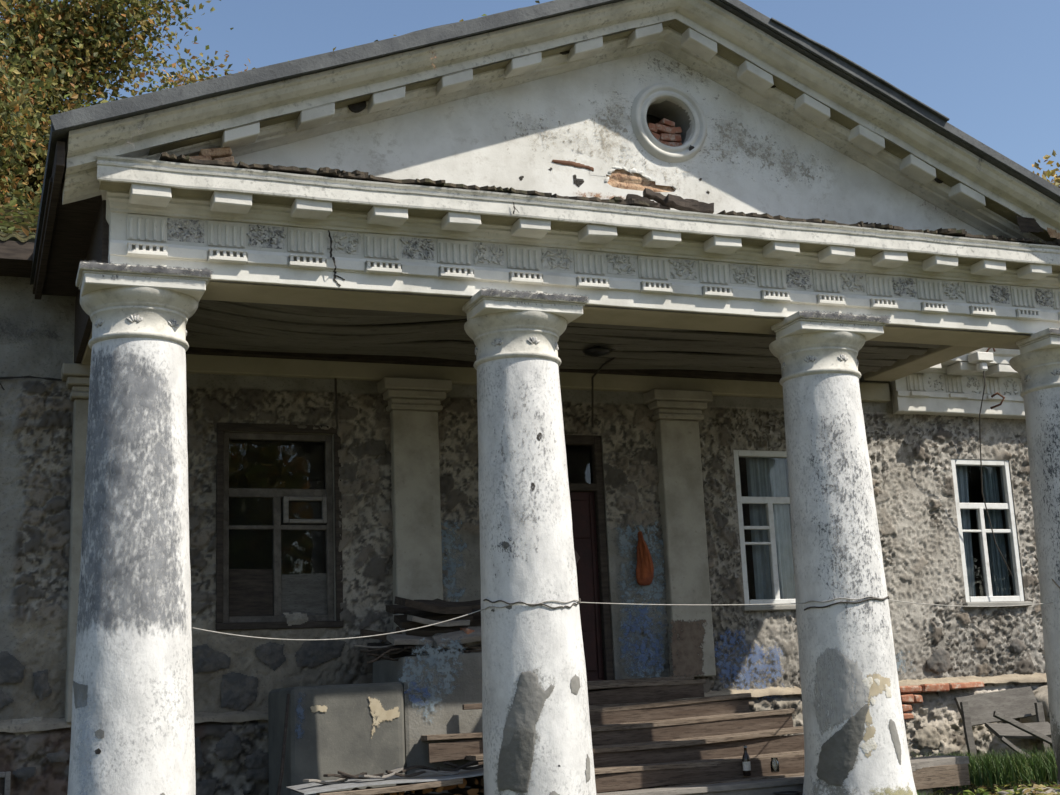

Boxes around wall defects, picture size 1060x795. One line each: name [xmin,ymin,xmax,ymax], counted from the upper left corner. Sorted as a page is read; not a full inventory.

spalling [549,159,678,192]
crack [328,230,345,287]
damp [76,349,186,634]
peeling [617,519,784,700]
peeling [368,638,463,739]